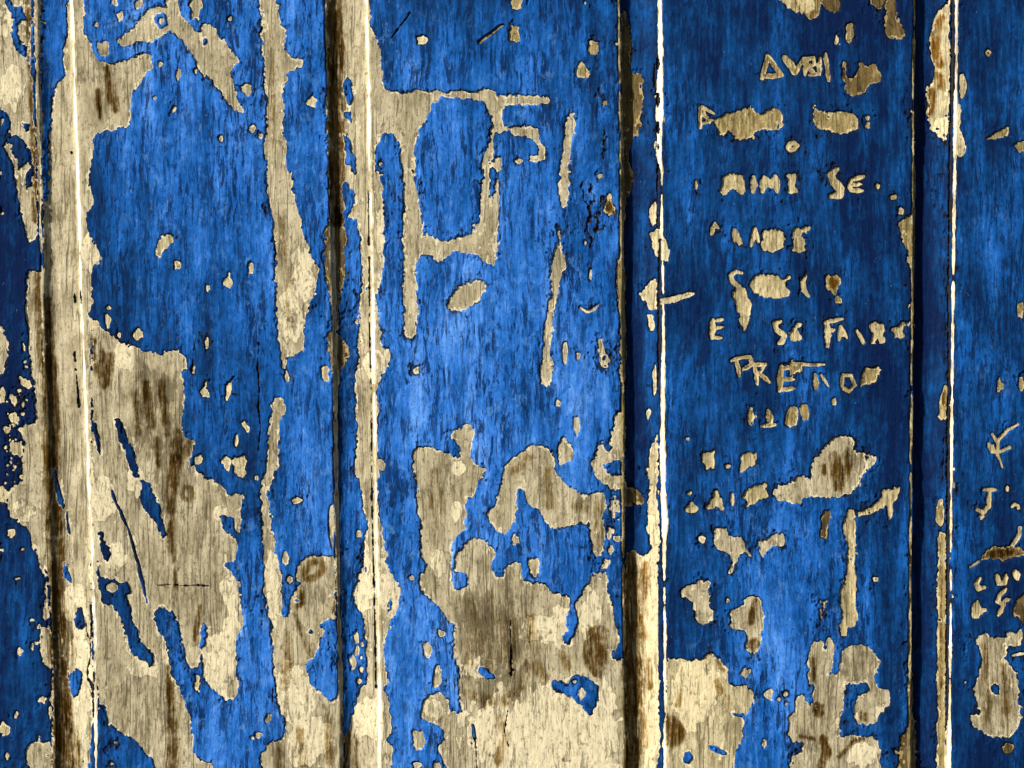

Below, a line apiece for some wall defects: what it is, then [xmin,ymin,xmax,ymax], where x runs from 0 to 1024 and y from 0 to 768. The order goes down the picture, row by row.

peeling [0,0,252,768]
peeling [221,0,890,768]
peeling [926,0,967,157]
peeling [964,593,1024,753]